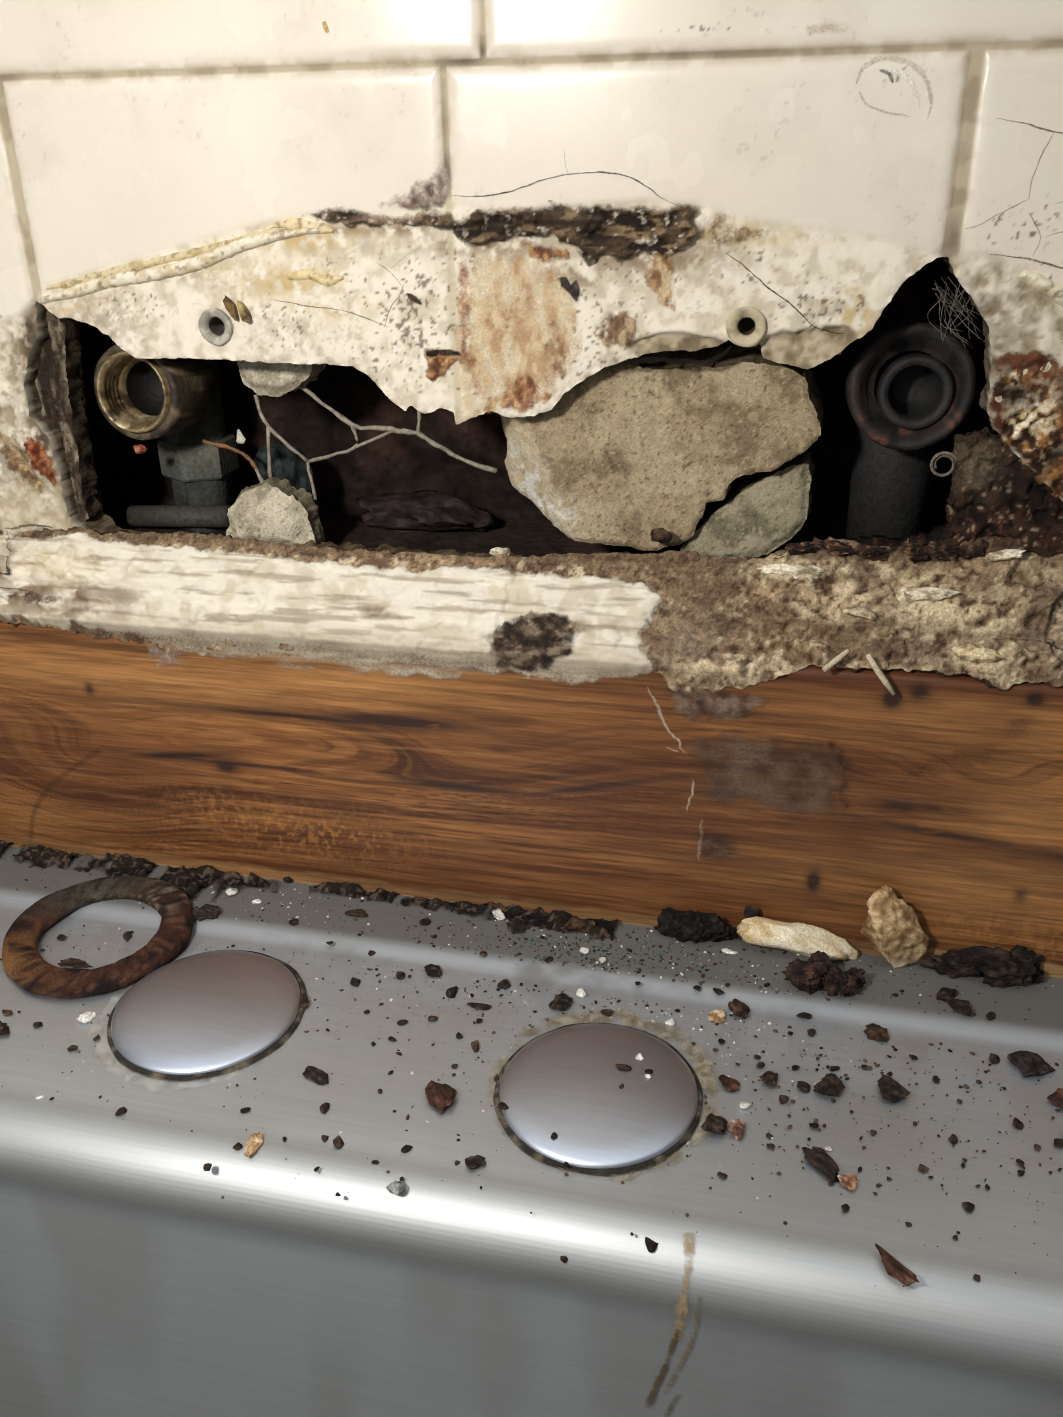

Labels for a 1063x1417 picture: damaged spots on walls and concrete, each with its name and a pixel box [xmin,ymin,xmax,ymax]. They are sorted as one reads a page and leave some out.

crack [990,118,1063,269]
corrosion [0,434,56,494]
spalling [79,321,227,536]
spalling [424,350,462,381]
spalling [217,359,682,557]
corrosion [458,243,575,412]
corrosion [596,312,636,347]
corrosion [645,252,673,306]
spalling [755,257,1063,582]
corrosion [990,350,1063,498]
spalling [489,612,572,671]
flaking render [894,586,961,602]